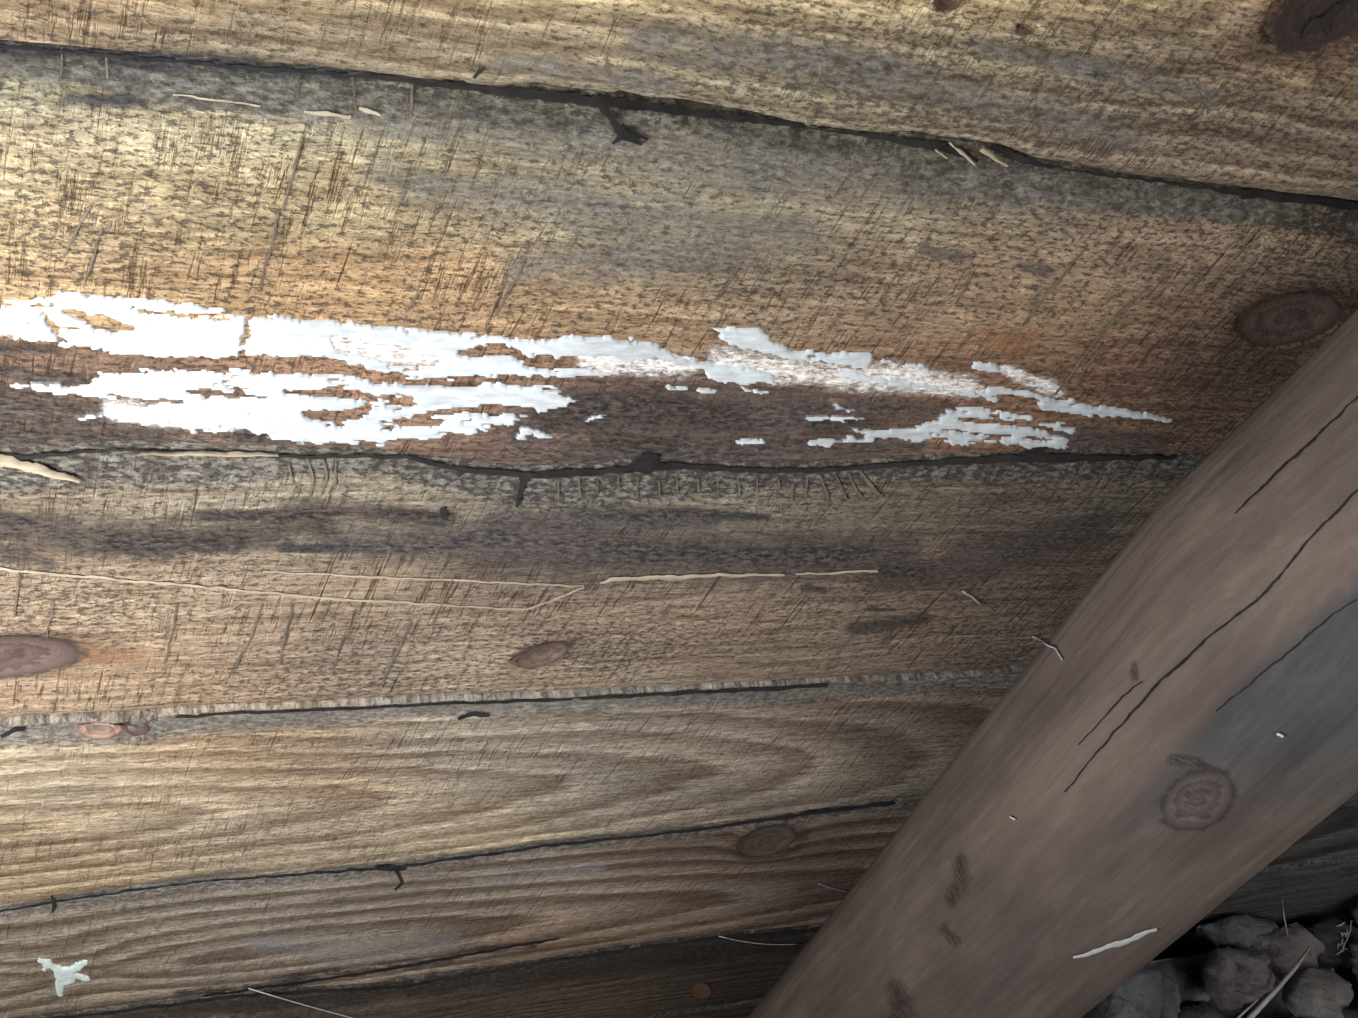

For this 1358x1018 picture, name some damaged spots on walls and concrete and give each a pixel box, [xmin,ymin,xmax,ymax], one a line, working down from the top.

peeling [0,290,1173,449]